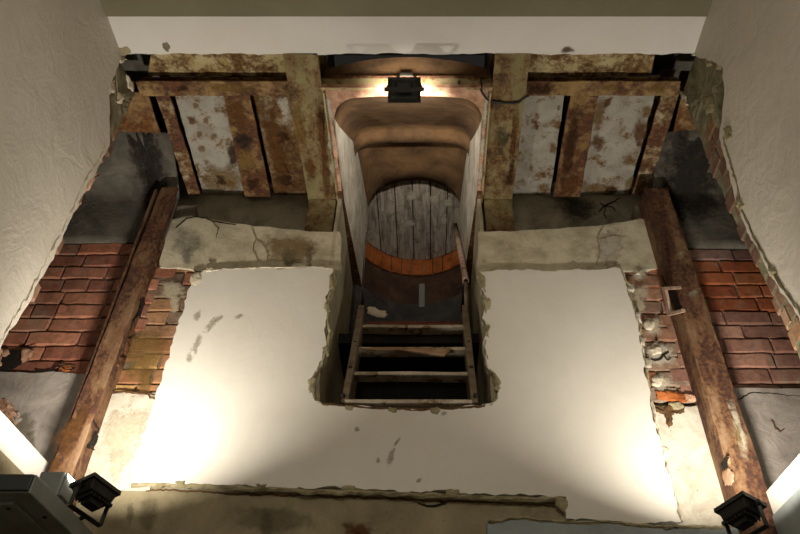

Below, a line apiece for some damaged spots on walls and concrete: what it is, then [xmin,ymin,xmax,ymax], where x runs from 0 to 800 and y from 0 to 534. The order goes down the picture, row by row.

rust [529,83,551,94]
rust [256,100,304,185]
rust [305,107,330,192]
rust [506,113,519,184]
rust [550,110,579,194]
flaking render [0,46,135,374]
crack [176,216,271,261]
crack [596,198,624,264]
flaking render [679,58,800,389]
flaking render [114,263,734,531]